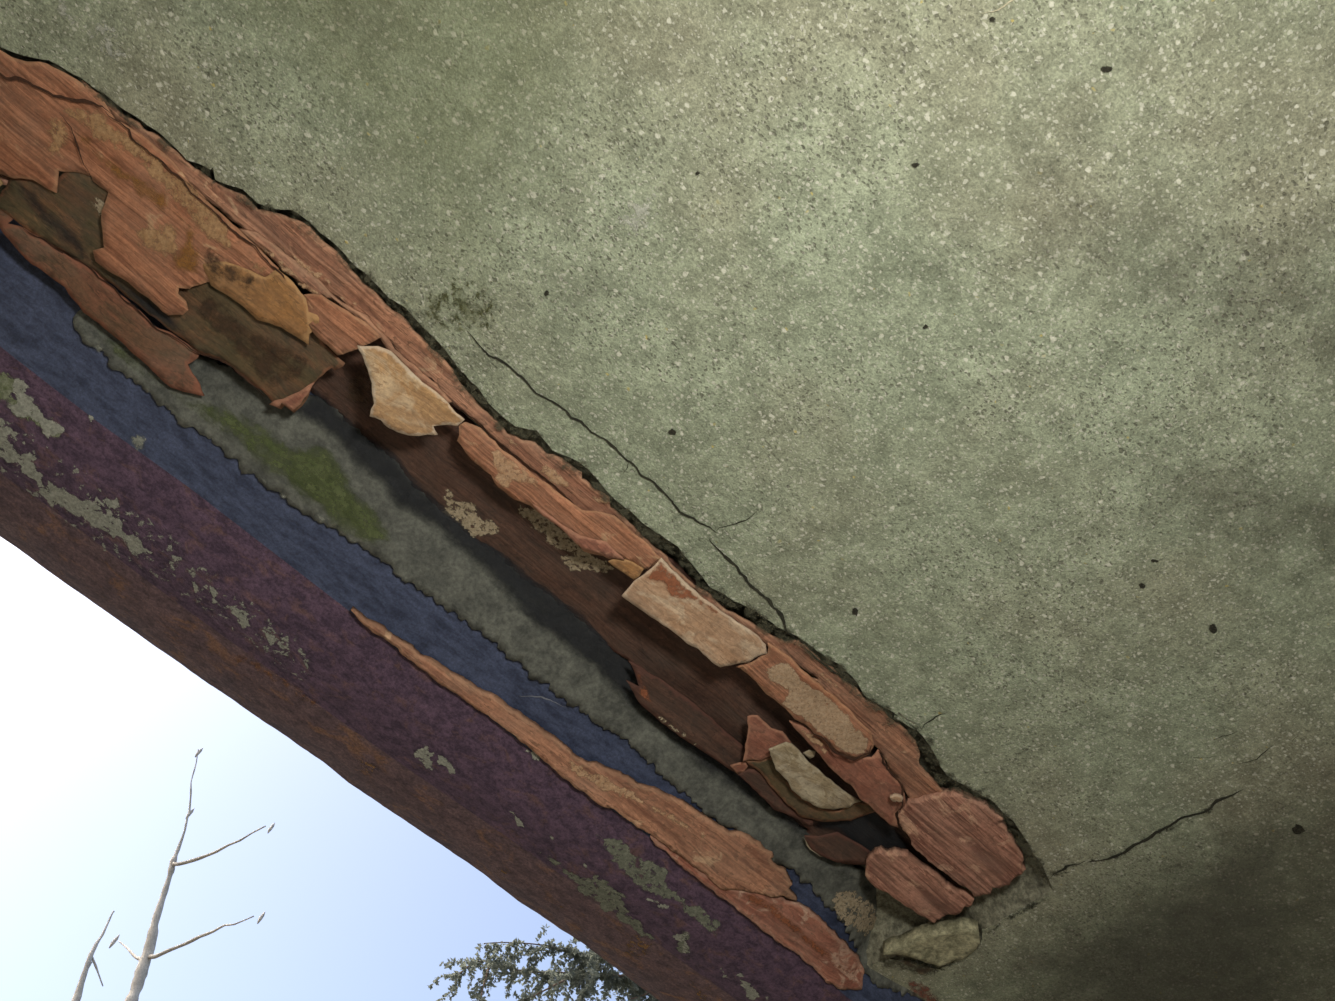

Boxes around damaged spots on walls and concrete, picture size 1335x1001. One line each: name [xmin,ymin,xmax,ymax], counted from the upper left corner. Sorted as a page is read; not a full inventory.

spalling [0,47,175,148]
spalling [189,161,1052,967]
crack [449,313,798,641]
crack [1051,732,1296,877]